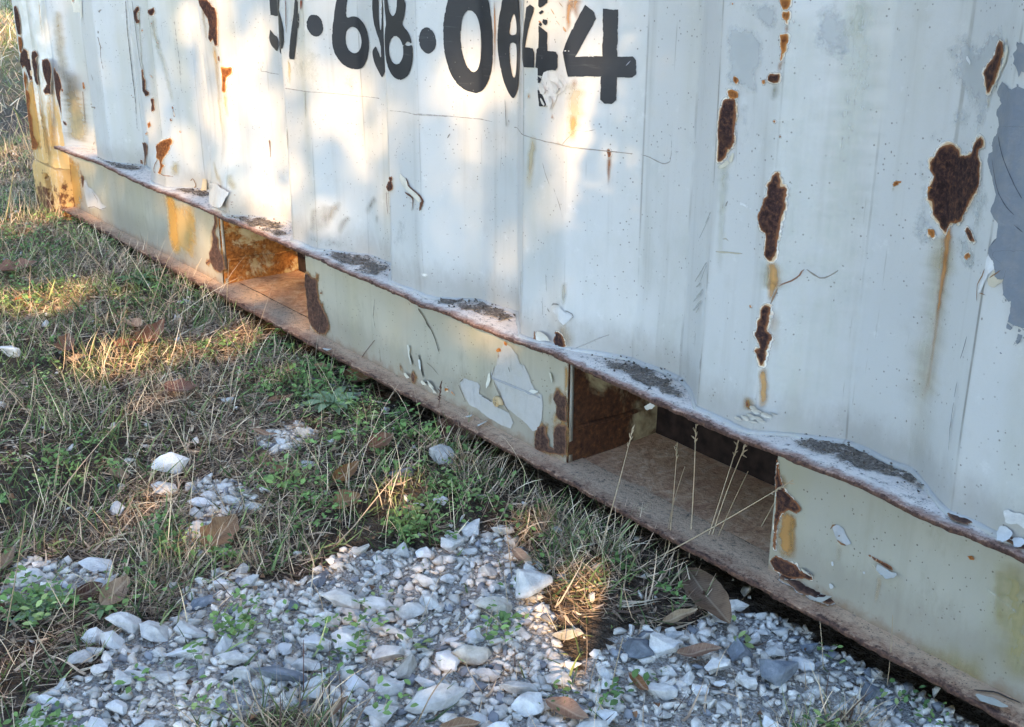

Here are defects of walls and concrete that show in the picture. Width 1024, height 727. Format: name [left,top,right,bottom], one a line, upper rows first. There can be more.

rust [14,6,67,155]
rust [198,0,233,106]
rust [716,76,739,169]
rust [981,38,1008,96]
rust [925,134,985,312]
rust [305,272,330,335]
rust [749,171,789,402]
peeling [976,255,1003,299]
peeling [444,342,543,431]
rust [534,369,569,457]
rust [770,460,835,605]
peeling [863,555,897,579]